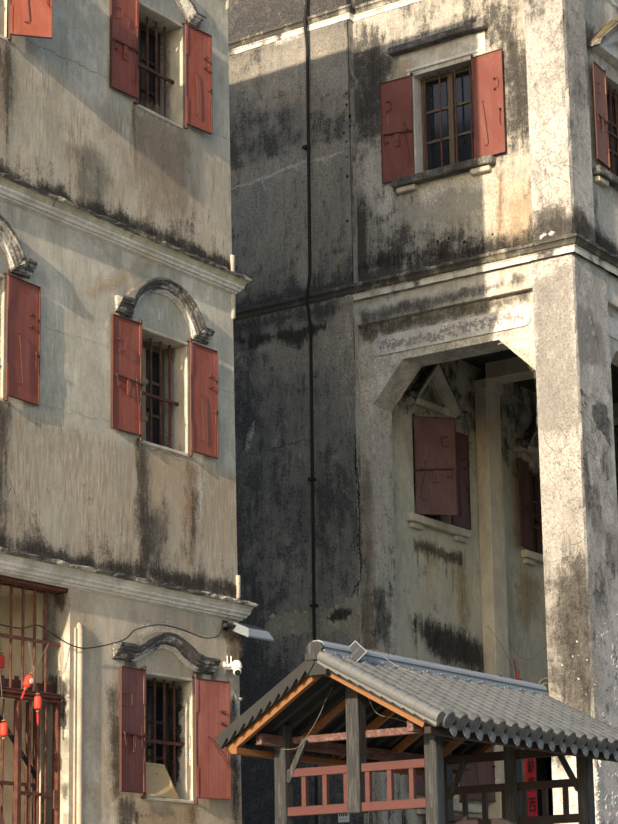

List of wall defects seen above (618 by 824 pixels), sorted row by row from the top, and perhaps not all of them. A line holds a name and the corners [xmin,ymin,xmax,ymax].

water stain [34,149,231,271]
peeling [376,310,524,353]
water stain [0,401,12,521]
water stain [0,438,237,598]
water stain [412,611,484,673]